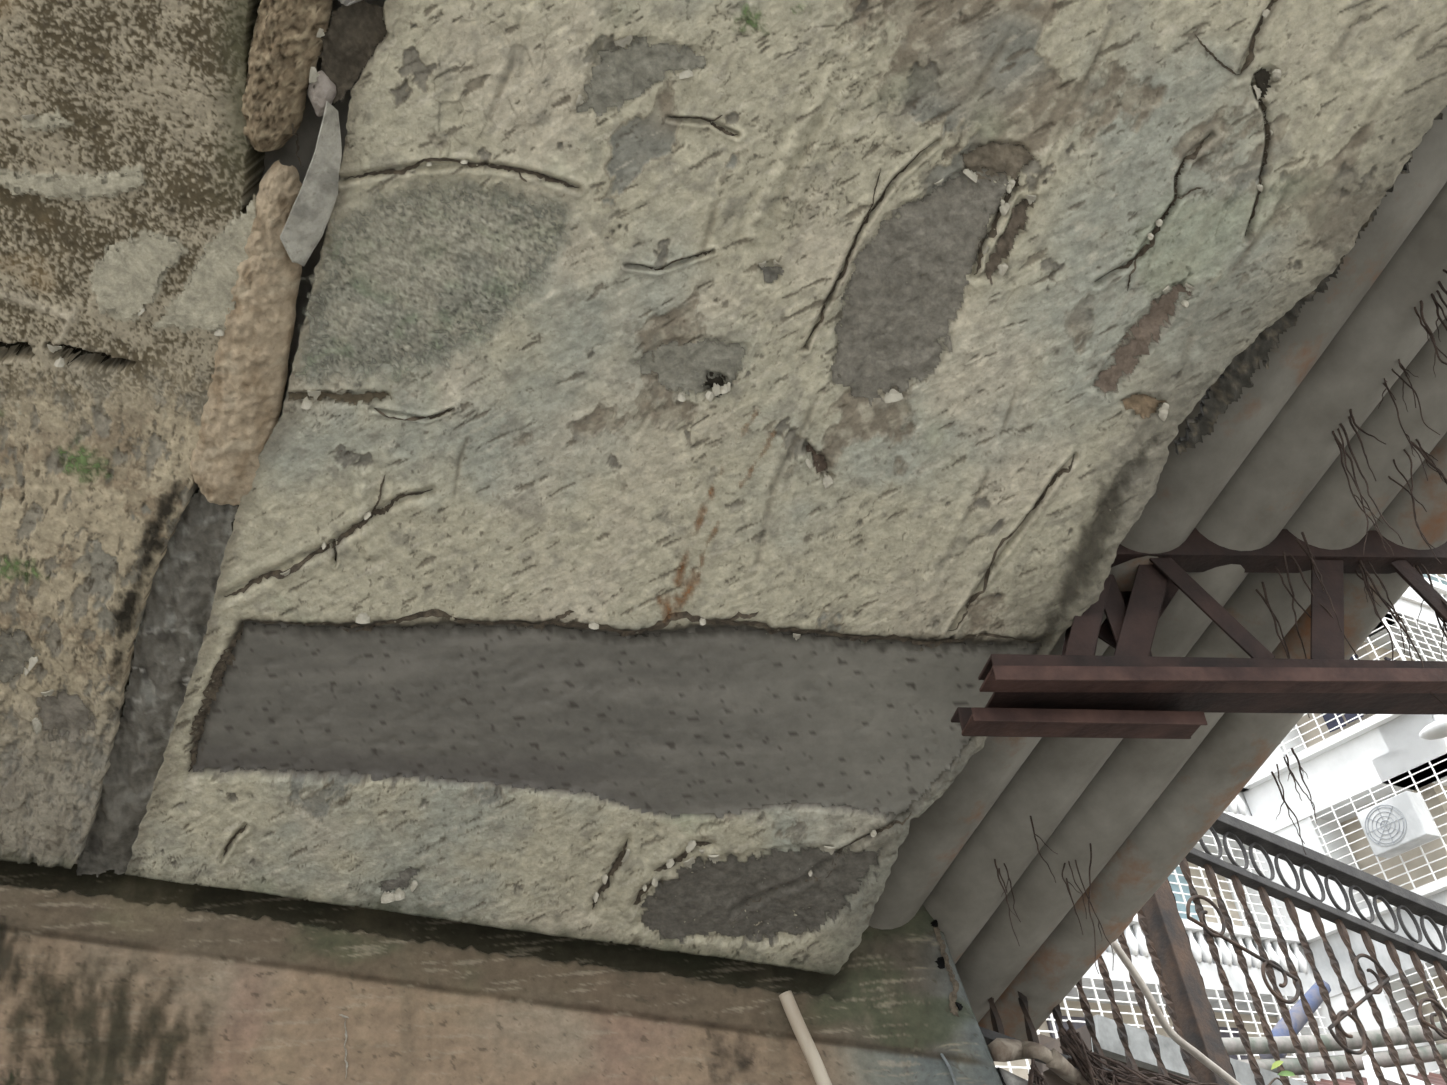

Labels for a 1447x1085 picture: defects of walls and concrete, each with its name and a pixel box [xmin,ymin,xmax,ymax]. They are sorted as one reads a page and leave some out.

peeling [576,35,706,117]
crack [1195,0,1278,236]
crack [374,408,453,421]
crack [805,141,936,345]
peeling [831,141,1036,406]
crack [974,175,1020,275]
peeling [1094,283,1195,421]
crack [1095,134,1210,291]
crack [189,454,1075,772]
peeling [641,846,882,947]
leakage [0,928,188,1085]